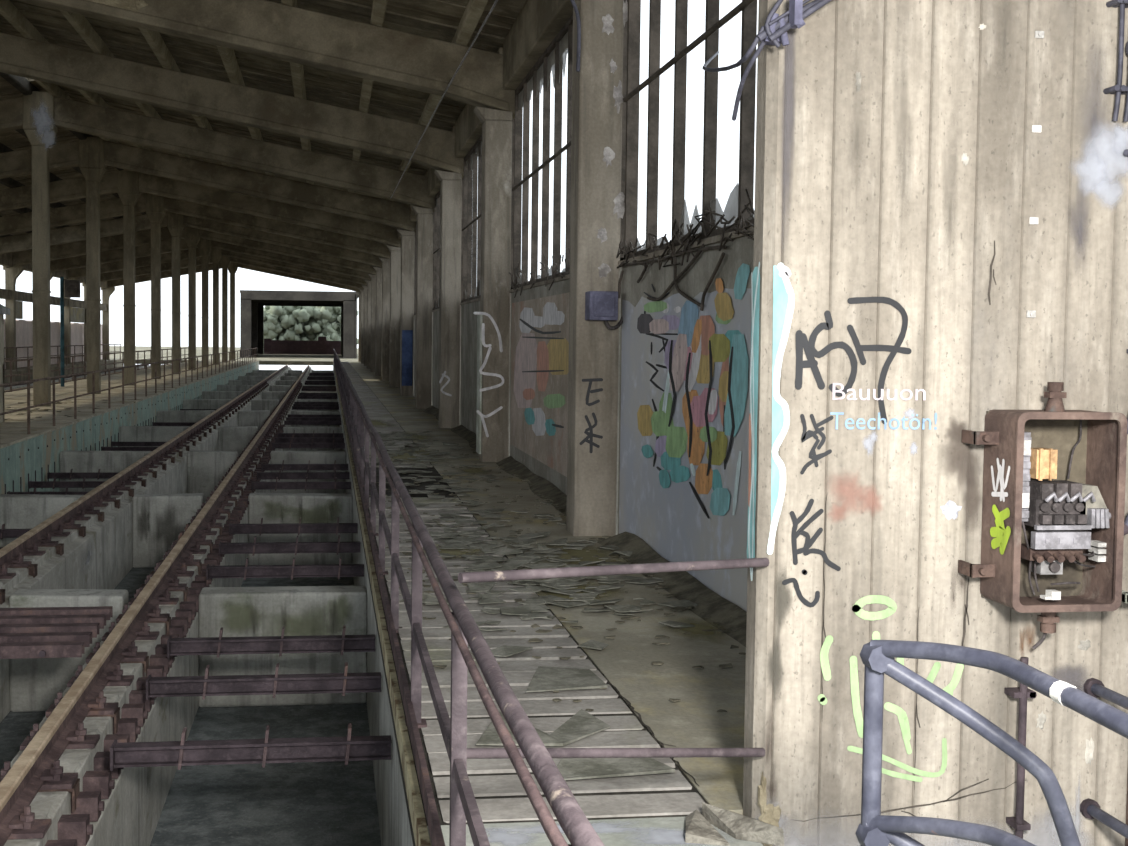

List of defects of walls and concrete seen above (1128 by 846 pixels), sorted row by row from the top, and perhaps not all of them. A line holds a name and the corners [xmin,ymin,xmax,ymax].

crack [592,663,699,786]